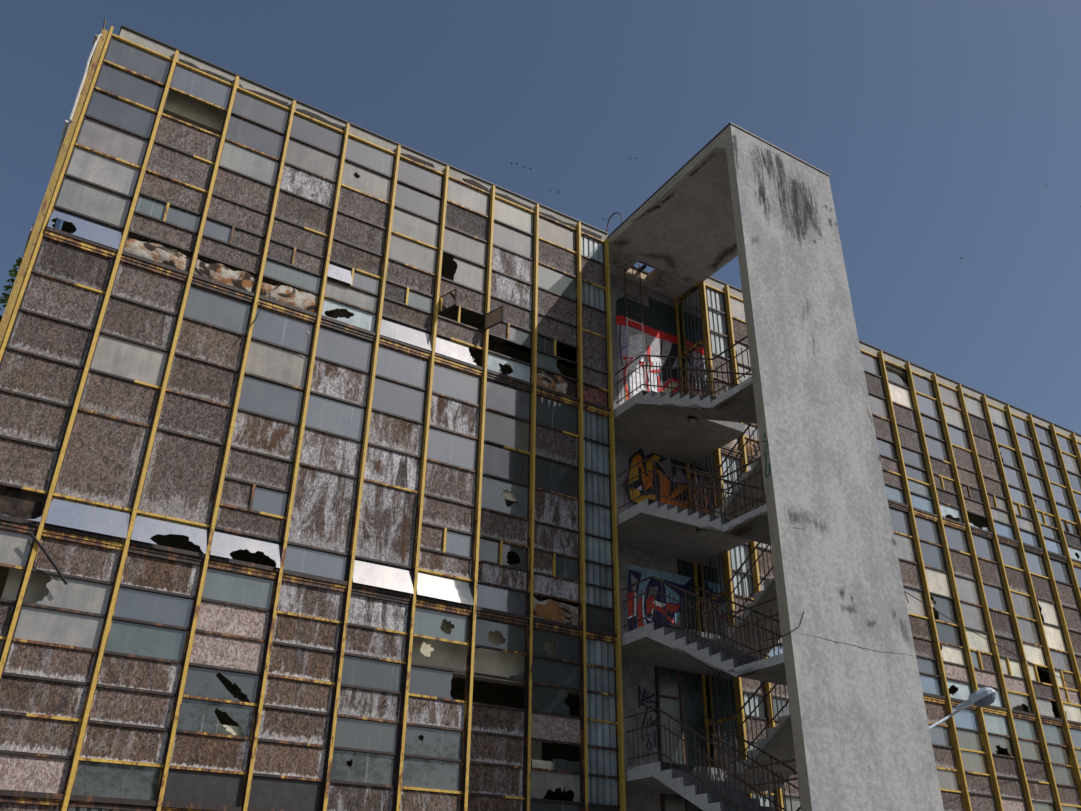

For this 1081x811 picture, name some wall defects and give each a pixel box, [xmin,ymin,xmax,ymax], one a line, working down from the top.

damp [756,146,832,243]